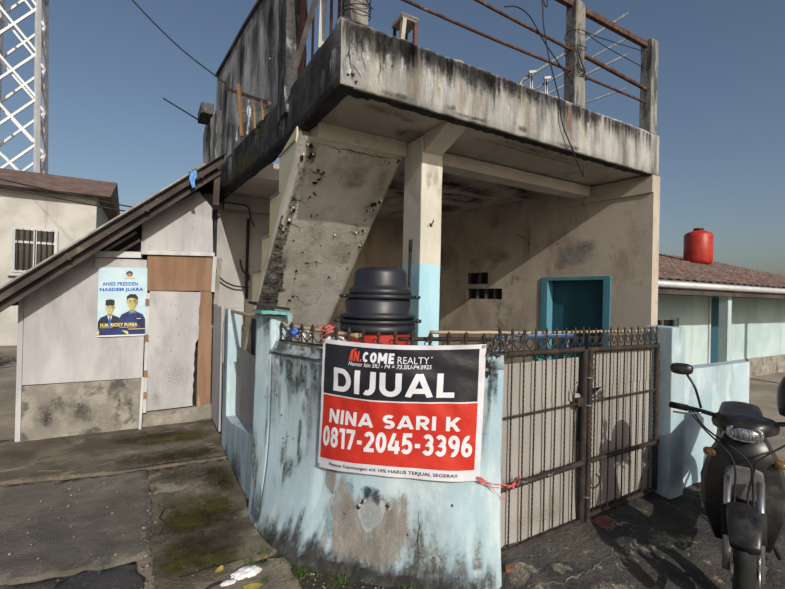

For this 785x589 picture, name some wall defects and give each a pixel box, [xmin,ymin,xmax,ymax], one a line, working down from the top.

water stain [224,0,274,119]
crack [346,33,385,82]
water stain [343,19,651,144]
spalling [255,197,297,315]
water stain [270,346,323,479]
water stain [251,496,493,589]
peeling [322,469,446,575]